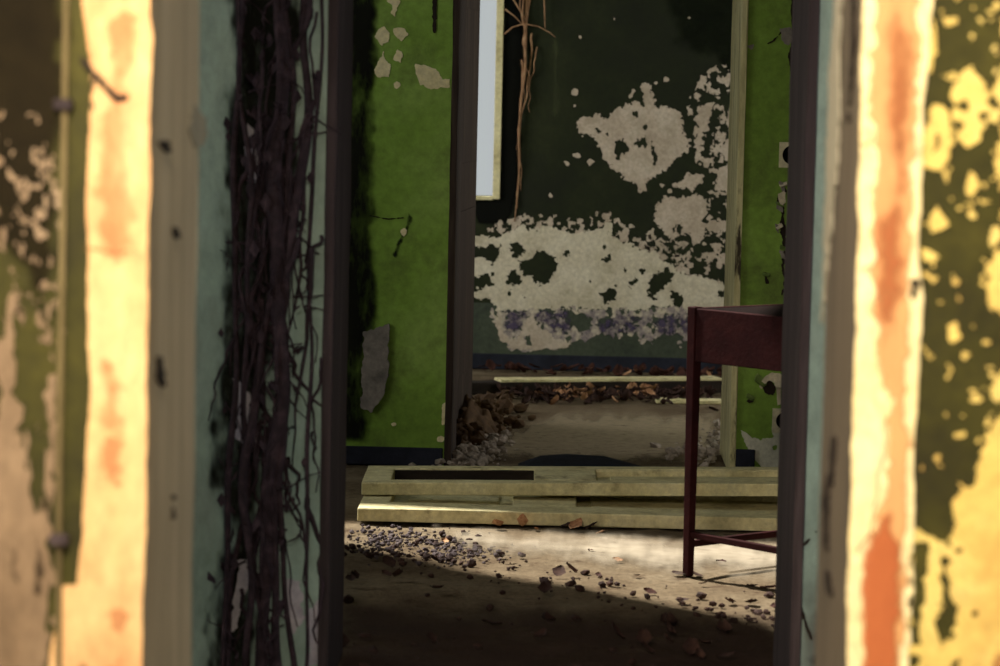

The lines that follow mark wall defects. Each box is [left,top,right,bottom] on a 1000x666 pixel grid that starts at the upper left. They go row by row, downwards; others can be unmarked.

peeling [374,26,408,89]
peeling [387,0,400,16]
peeling [415,64,450,89]
crack [767,0,793,65]
flaking render [474,65,731,352]
peeling [775,181,787,259]
flaking render [0,0,153,666]
flaking render [846,0,1000,666]
peeling [746,372,781,405]
spalling [741,430,780,467]